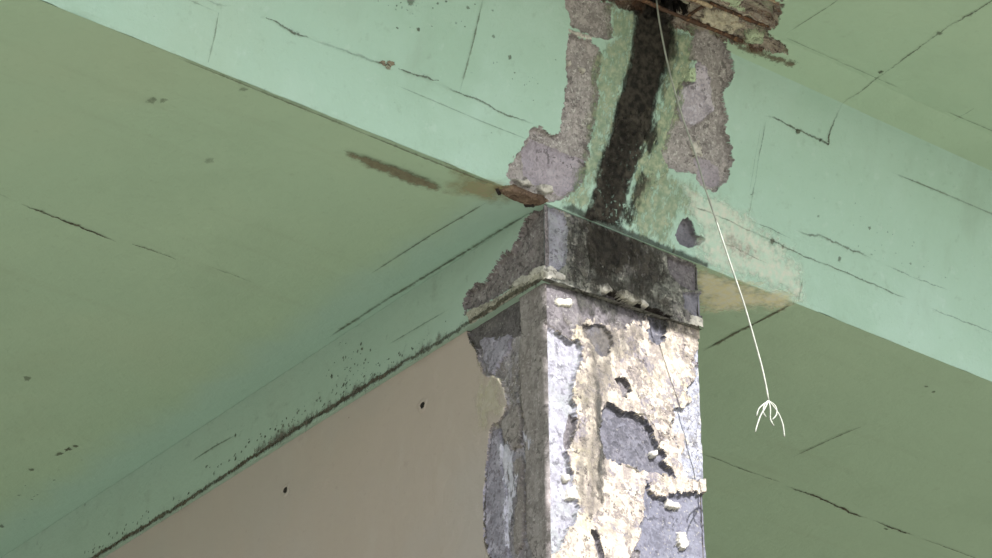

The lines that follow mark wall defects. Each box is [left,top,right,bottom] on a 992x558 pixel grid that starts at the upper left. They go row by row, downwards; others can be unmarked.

rust [735,41,794,66]
crack [398,68,517,118]
crack [761,119,834,146]
rust [349,153,438,190]
damp [564,0,803,330]
crack [32,208,106,238]
peeling [462,0,788,558]
damp [499,442,518,549]
crack [794,489,860,517]